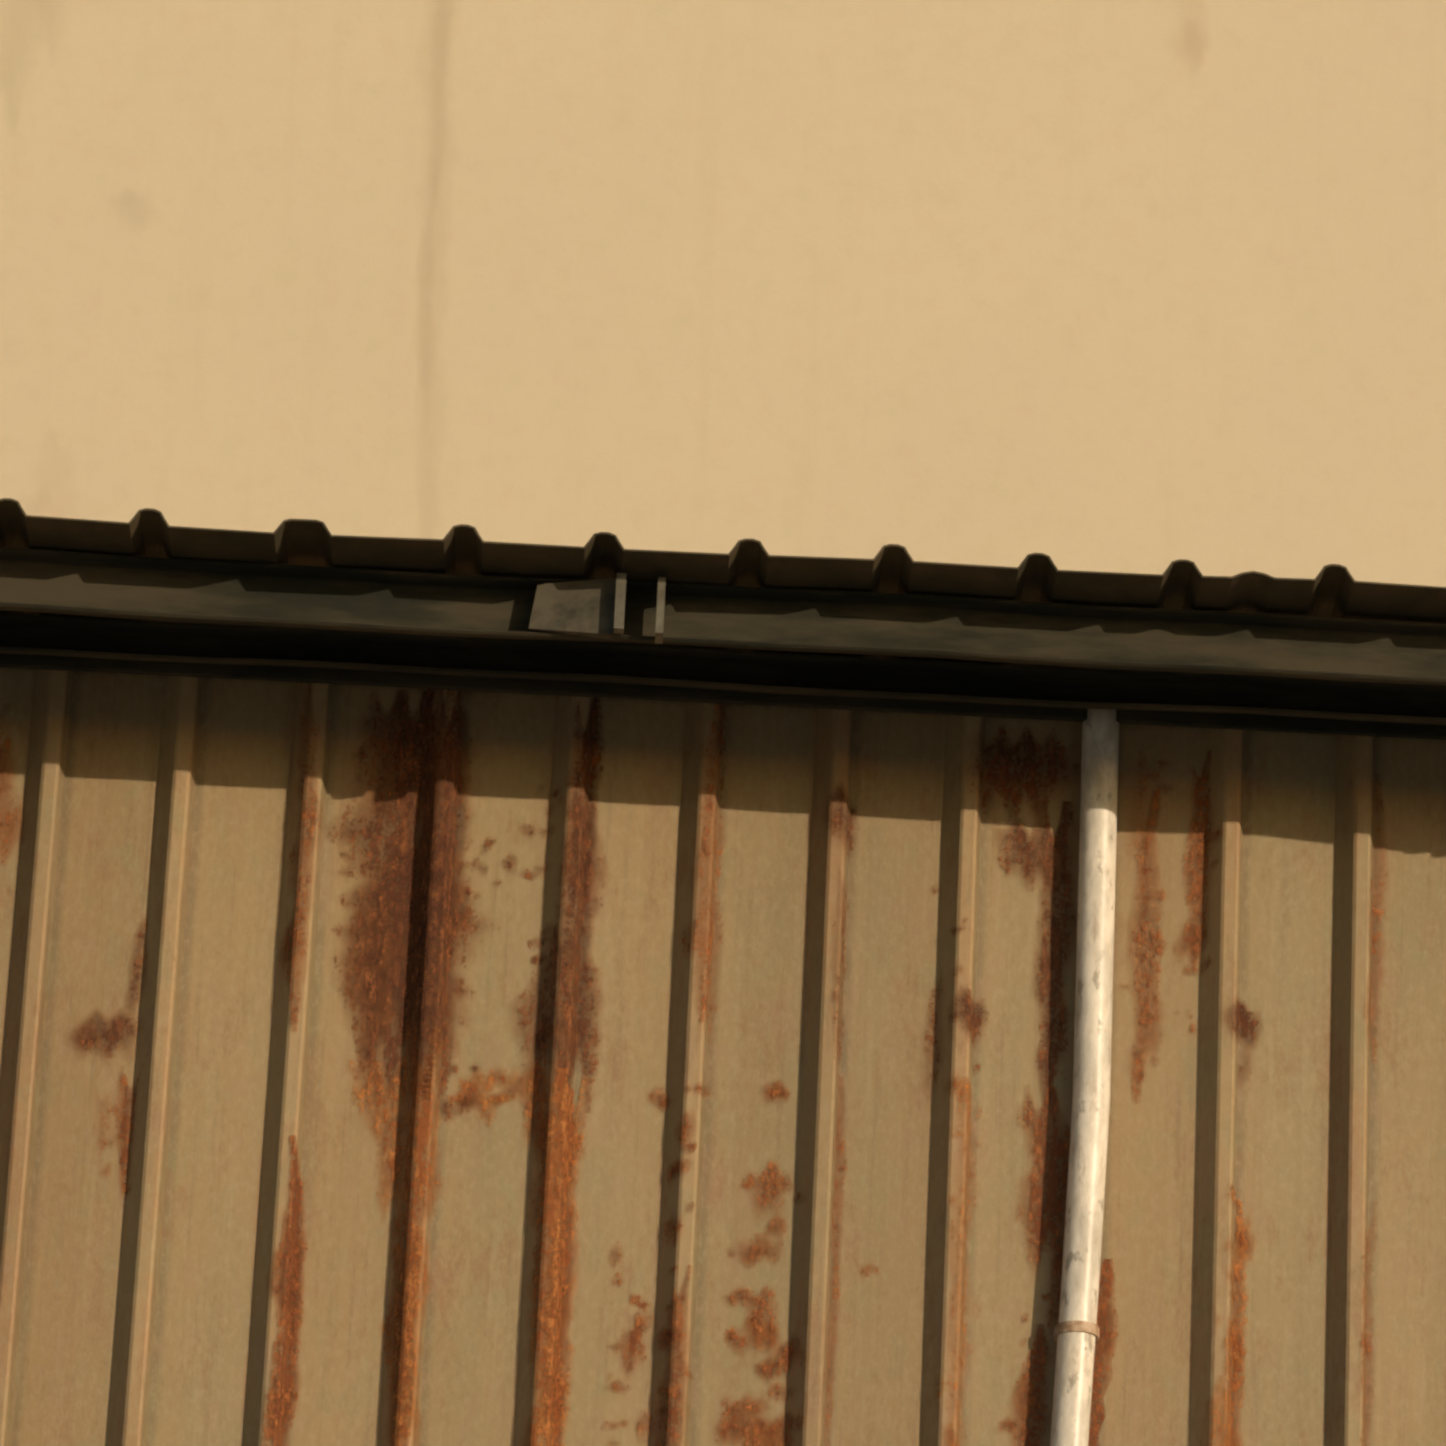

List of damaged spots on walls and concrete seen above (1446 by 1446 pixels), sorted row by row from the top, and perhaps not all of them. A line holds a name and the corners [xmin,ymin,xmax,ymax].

rust [74,920,147,1058]
rust [101,1075,138,1193]
rust [262,1135,307,1446]
rust [279,683,321,1030]
rust [351,697,604,1446]
rust [606,1248,690,1446]
rust [716,1286,805,1446]
rust [730,1162,800,1264]
rust [959,727,1081,1446]
rust [1128,751,1222,1100]